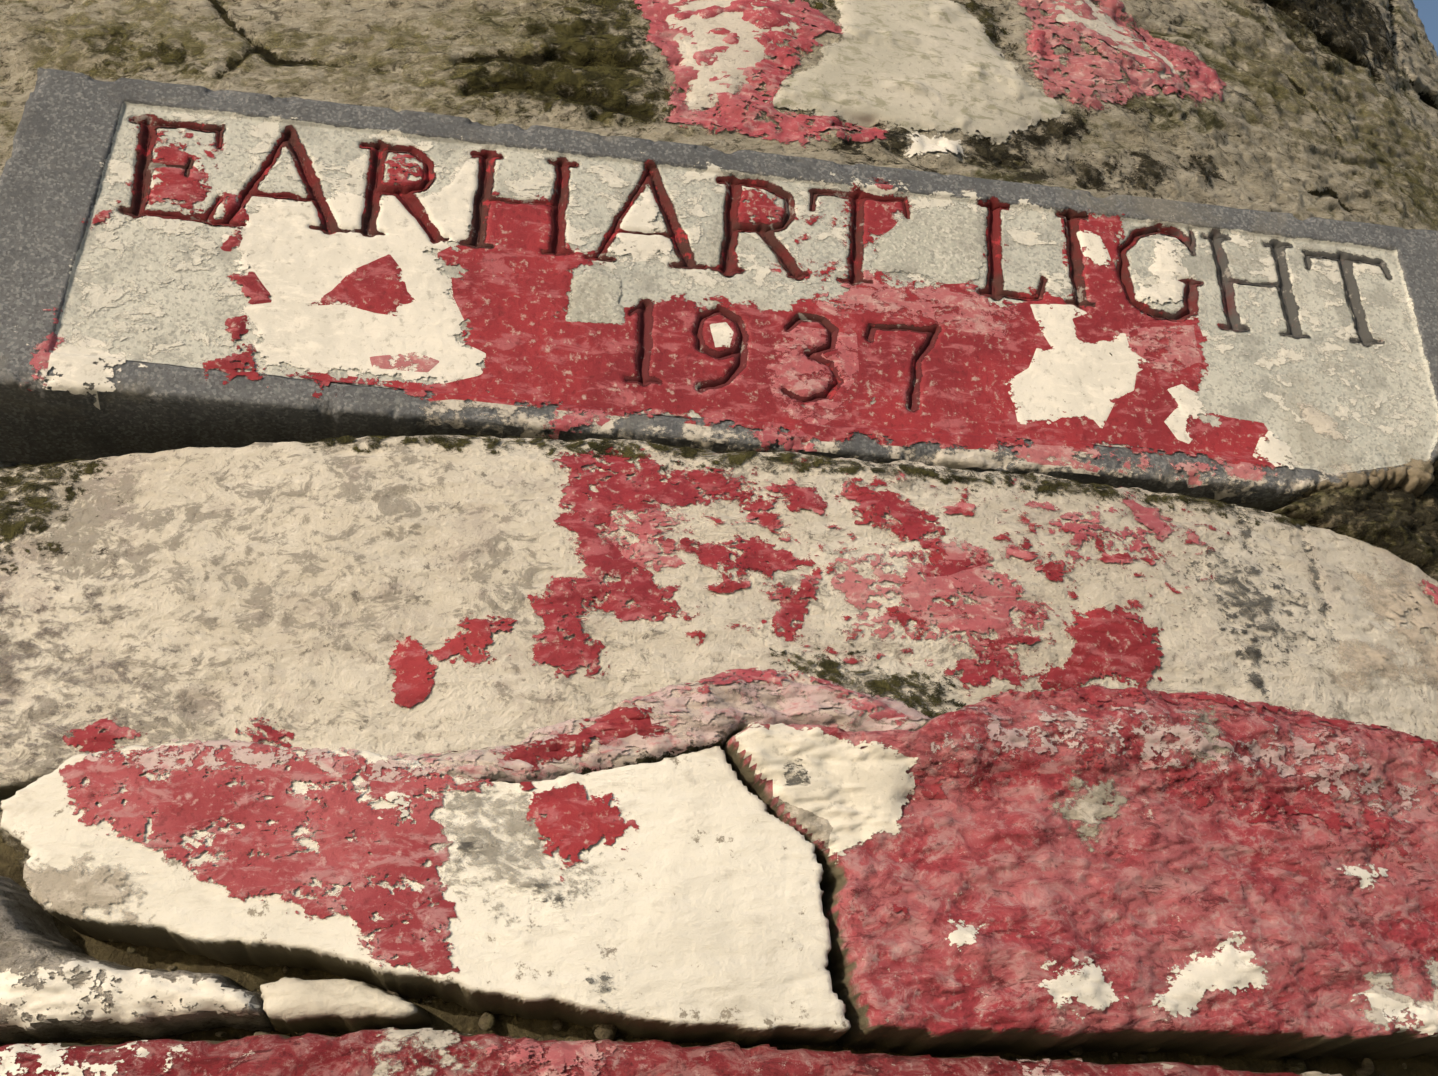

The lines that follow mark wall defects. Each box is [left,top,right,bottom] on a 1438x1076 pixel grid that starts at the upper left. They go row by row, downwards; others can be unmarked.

crack [208,0,338,79]
spalling [634,0,1227,158]
peeling [20,110,1438,898]
crack [1418,579,1438,605]
peeling [59,717,494,976]
peeling [945,919,985,952]
peeling [0,958,260,1076]
peeling [372,1027,632,1076]
peeling [999,1058,1083,1076]
peeling [1038,956,1129,1020]
peeling [1148,931,1269,1021]
spalling [1350,957,1438,1037]